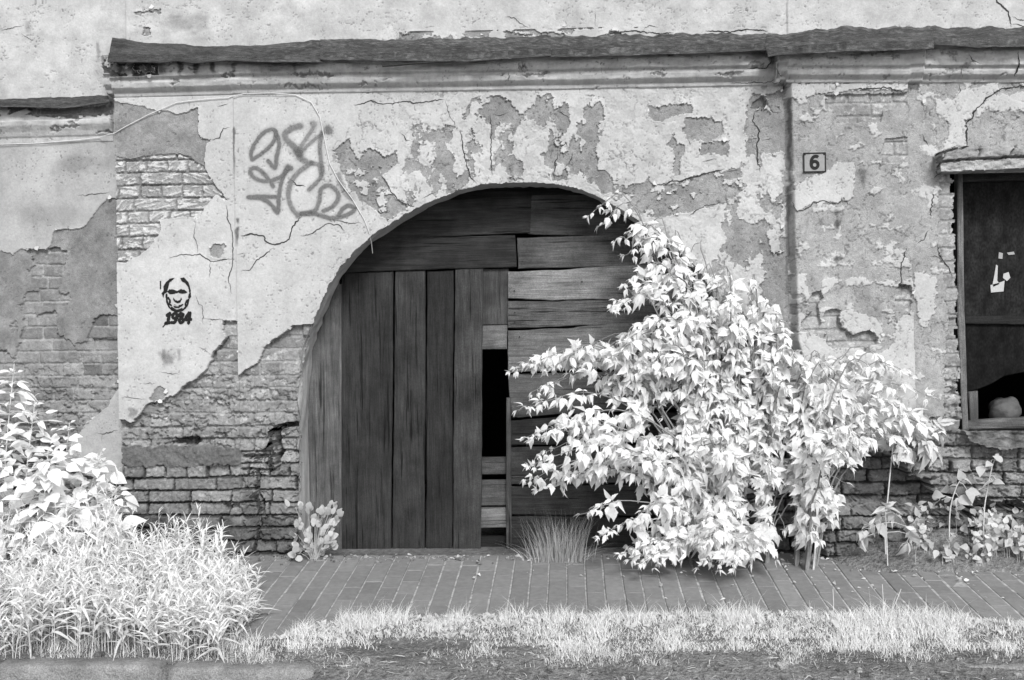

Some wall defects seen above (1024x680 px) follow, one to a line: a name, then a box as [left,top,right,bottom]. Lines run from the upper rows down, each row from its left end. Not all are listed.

spalling [101,55,159,82]
spalling [0,100,314,557]
crack [170,205,360,290]
peeling [333,82,1024,562]
crack [657,62,781,185]
crack [900,53,1024,287]